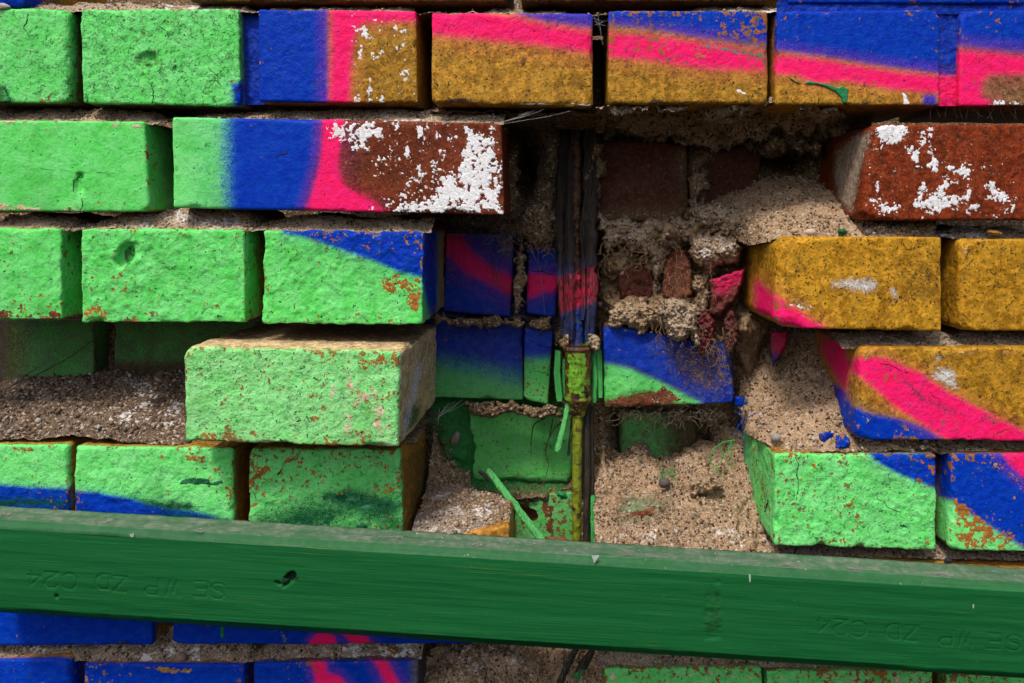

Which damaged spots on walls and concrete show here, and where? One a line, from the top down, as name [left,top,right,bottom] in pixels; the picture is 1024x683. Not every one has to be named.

peeling [607,385,688,407]
peeling [541,502,555,537]